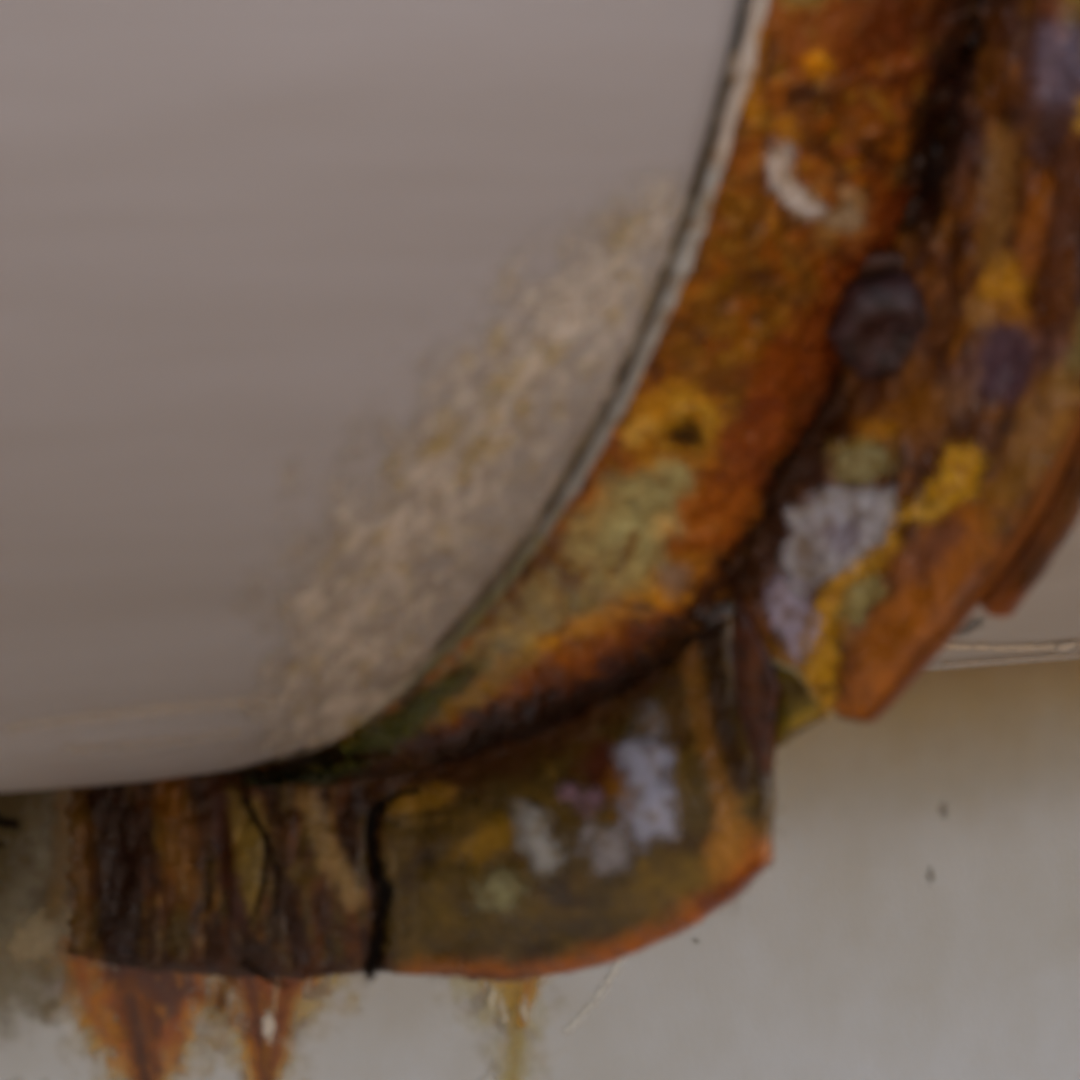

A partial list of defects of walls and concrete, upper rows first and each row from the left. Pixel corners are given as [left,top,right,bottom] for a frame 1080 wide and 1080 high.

corrosion [239,0,1080,804]
corrosion [48,929,336,1080]